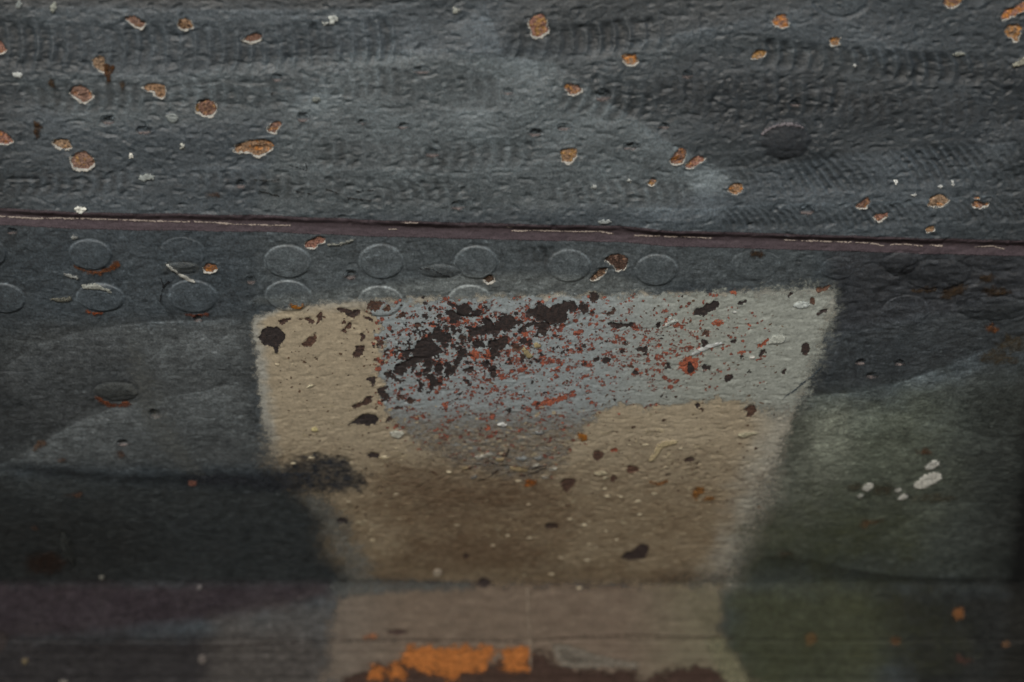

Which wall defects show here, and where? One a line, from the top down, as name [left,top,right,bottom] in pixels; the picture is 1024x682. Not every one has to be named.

peeling [527,14,550,40]
peeling [69,85,95,104]
peeling [141,83,167,100]
peeling [195,99,217,118]
peeling [51,139,95,172]
peeling [560,148,578,165]
peeling [669,148,706,169]
peeling [927,180,955,208]
peeling [342,254,837,479]
water stain [184,452,470,598]